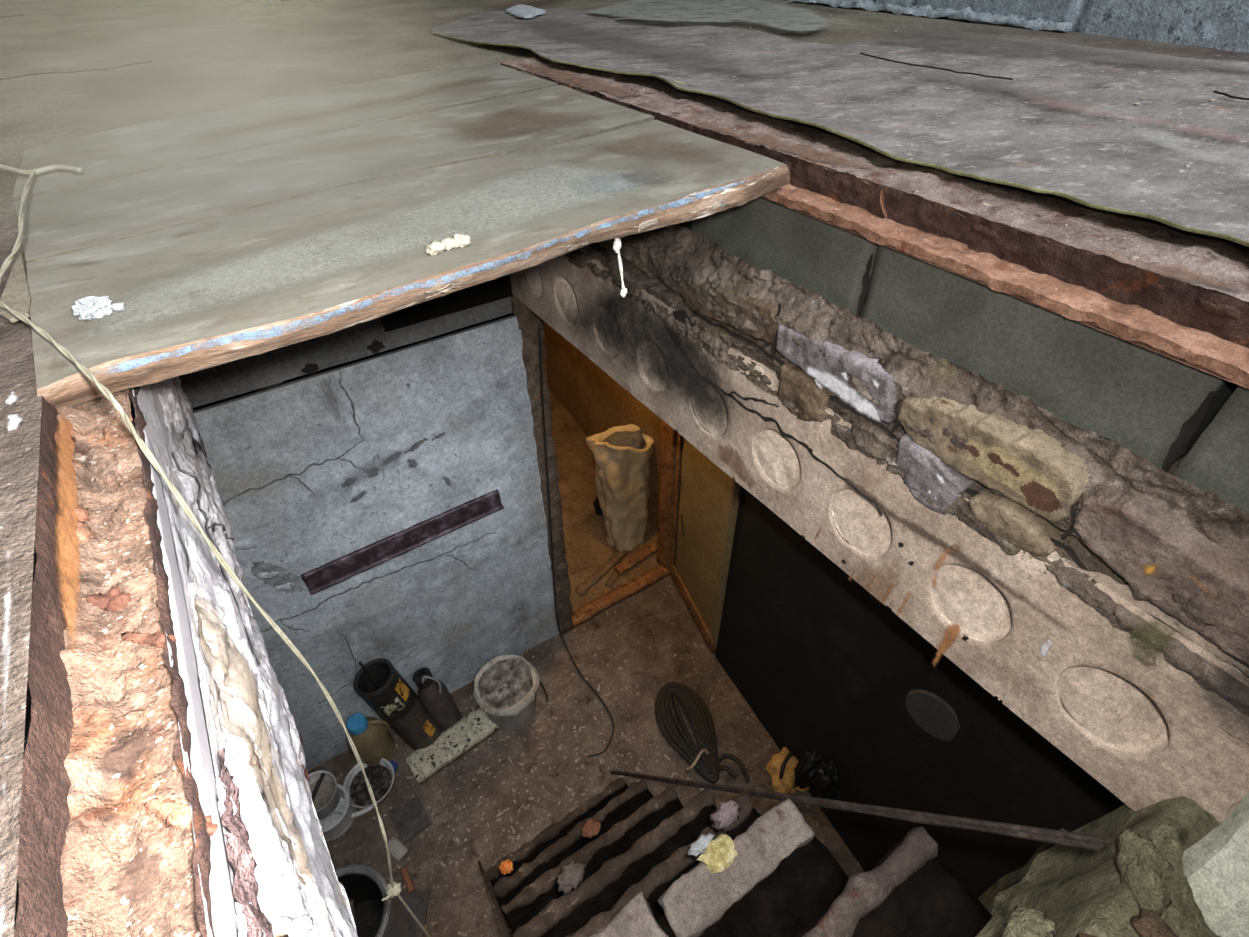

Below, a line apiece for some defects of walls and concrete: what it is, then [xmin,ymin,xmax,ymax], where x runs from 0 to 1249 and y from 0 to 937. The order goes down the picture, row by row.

crack [0,61,152,80]
crack [860,52,1013,80]
crack [1213,91,1249,100]
crack [171,370,496,704]
peeling [189,579,322,937]